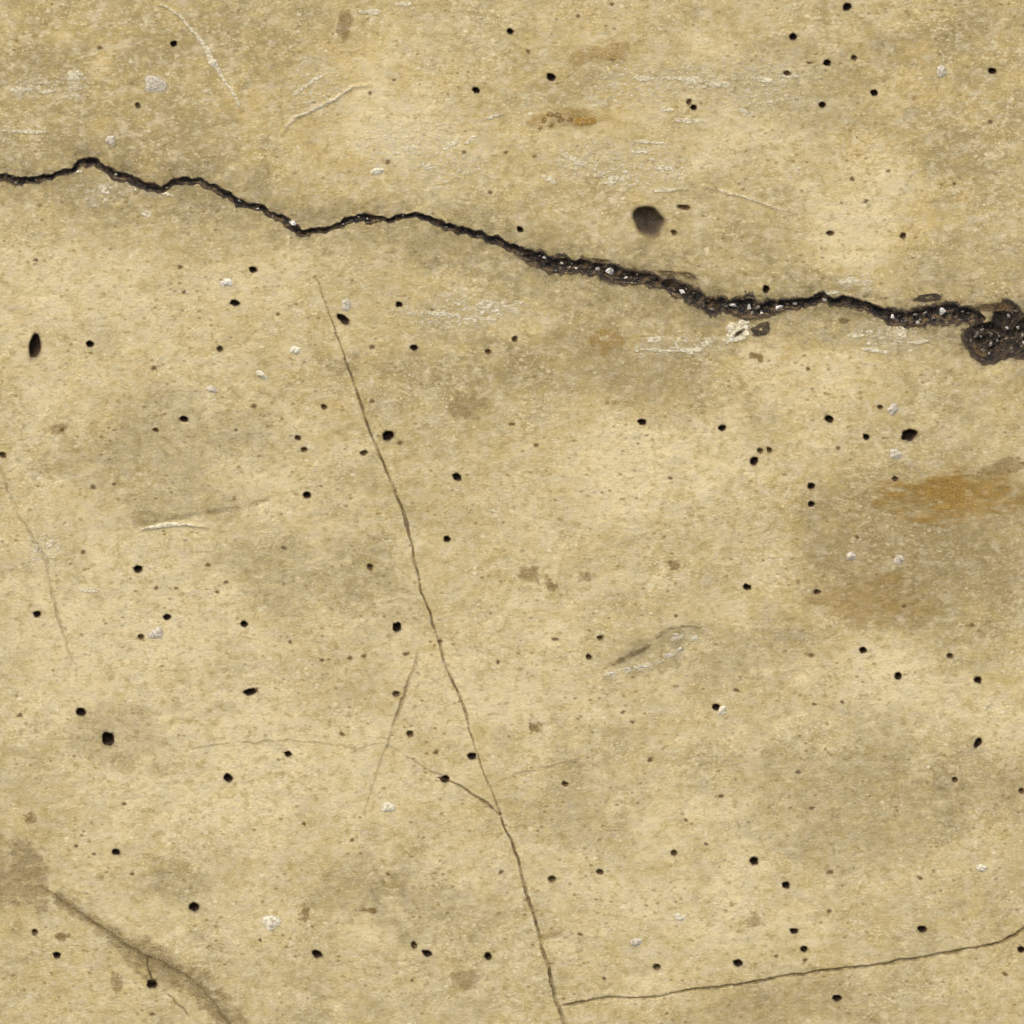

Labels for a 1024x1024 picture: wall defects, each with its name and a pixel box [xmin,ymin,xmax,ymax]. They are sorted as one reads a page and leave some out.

crack [0,157,985,336]
crack [350,371,467,719]
crack [463,788,586,1012]
crack [695,948,964,989]